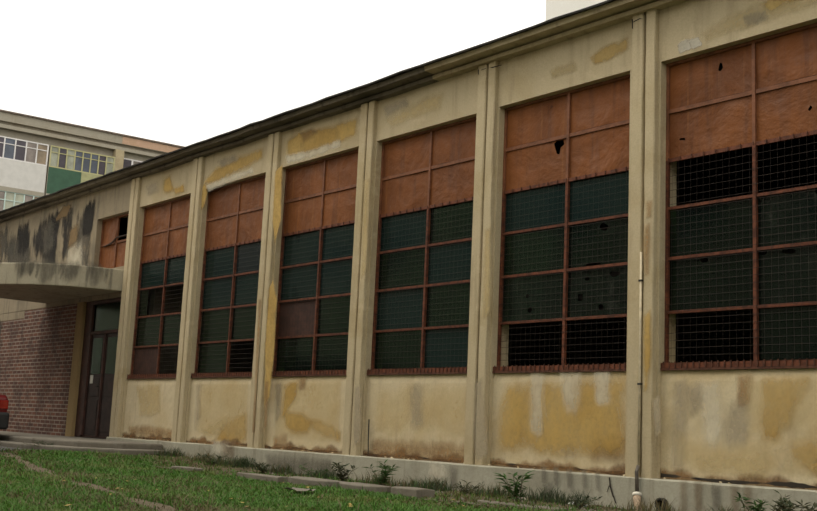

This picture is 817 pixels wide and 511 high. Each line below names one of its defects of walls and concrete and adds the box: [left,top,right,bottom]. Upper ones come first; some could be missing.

mould [0,200,100,281]
water stain [763,379,806,439]